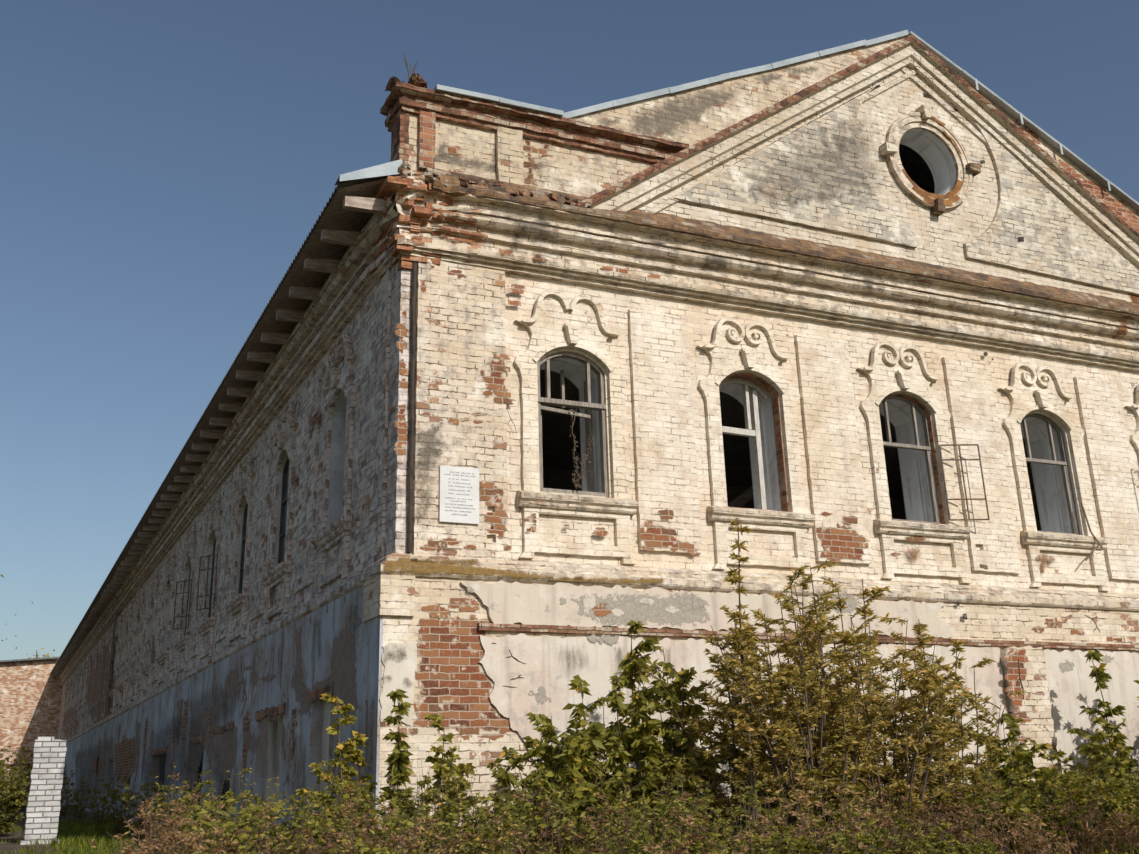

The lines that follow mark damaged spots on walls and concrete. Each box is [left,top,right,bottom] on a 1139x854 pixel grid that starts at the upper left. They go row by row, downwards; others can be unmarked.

spalling [1059,159,1139,233]
peeling [449,353,513,425]
peeling [420,538,476,552]
peeling [479,480,512,551]
peeling [523,513,536,533]
peeling [638,509,697,555]
peeling [816,512,868,562]
peeling [560,591,711,645]
peeling [313,618,361,715]
spalling [412,587,518,740]
spalling [1004,648,1044,742]
peeling [207,708,251,781]